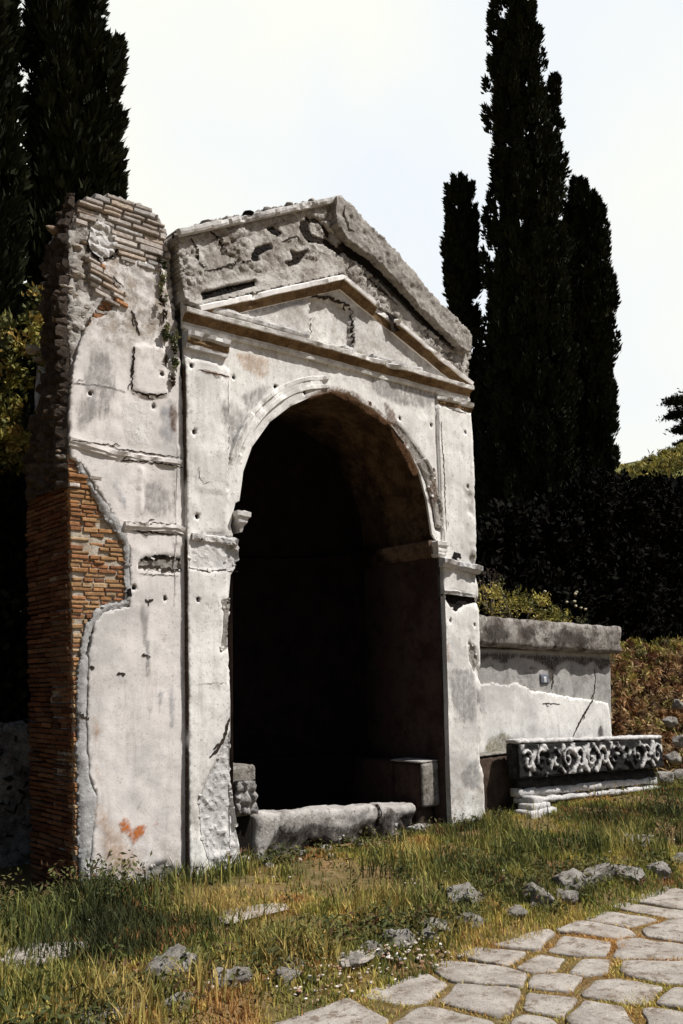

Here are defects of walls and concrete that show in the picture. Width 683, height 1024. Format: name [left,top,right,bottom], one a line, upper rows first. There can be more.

spalling [74,194,171,326]
spalling [64,454,239,888]
crack [573,669,596,737]
crack [209,718,230,758]
rust [120,818,145,842]